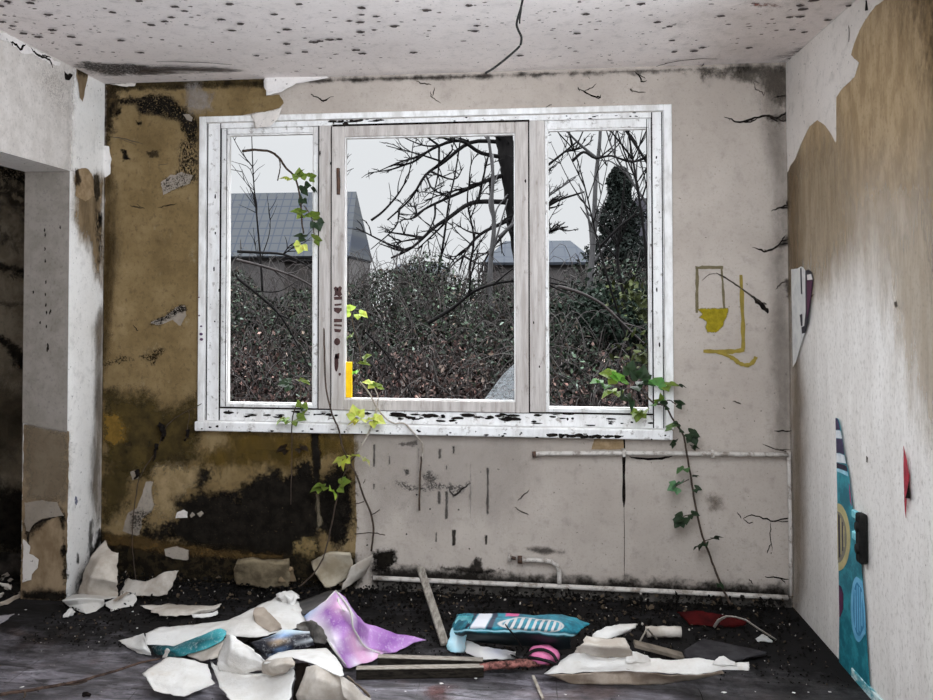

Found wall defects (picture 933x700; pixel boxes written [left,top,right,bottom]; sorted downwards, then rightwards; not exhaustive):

water stain [0,0,264,181]
crack [725,81,786,123]
water stain [0,166,34,553]
flaking render [20,424,70,601]
water stain [74,175,360,589]
flaking render [75,79,362,561]
peeling [389,412,574,437]
flaking render [535,418,633,450]
water stain [371,354,801,602]
crack [737,512,788,553]
crack [753,235,790,253]
water stain [788,0,933,420]